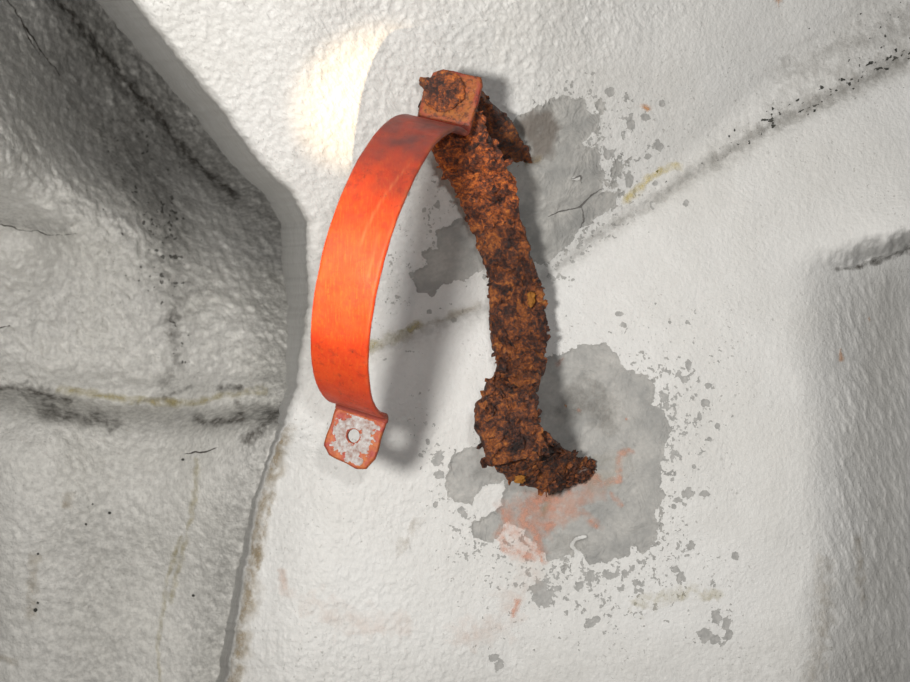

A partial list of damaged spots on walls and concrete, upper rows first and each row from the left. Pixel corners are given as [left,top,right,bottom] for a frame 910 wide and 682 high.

crack [7,0,59,74]
water stain [761,14,910,128]
crack [0,224,77,236]
water stain [139,189,185,259]
peeling [385,180,487,314]
crack [548,175,603,228]
peeling [506,69,670,287]
peeling [410,311,733,635]
spalling [488,647,504,672]
spalling [683,603,743,658]